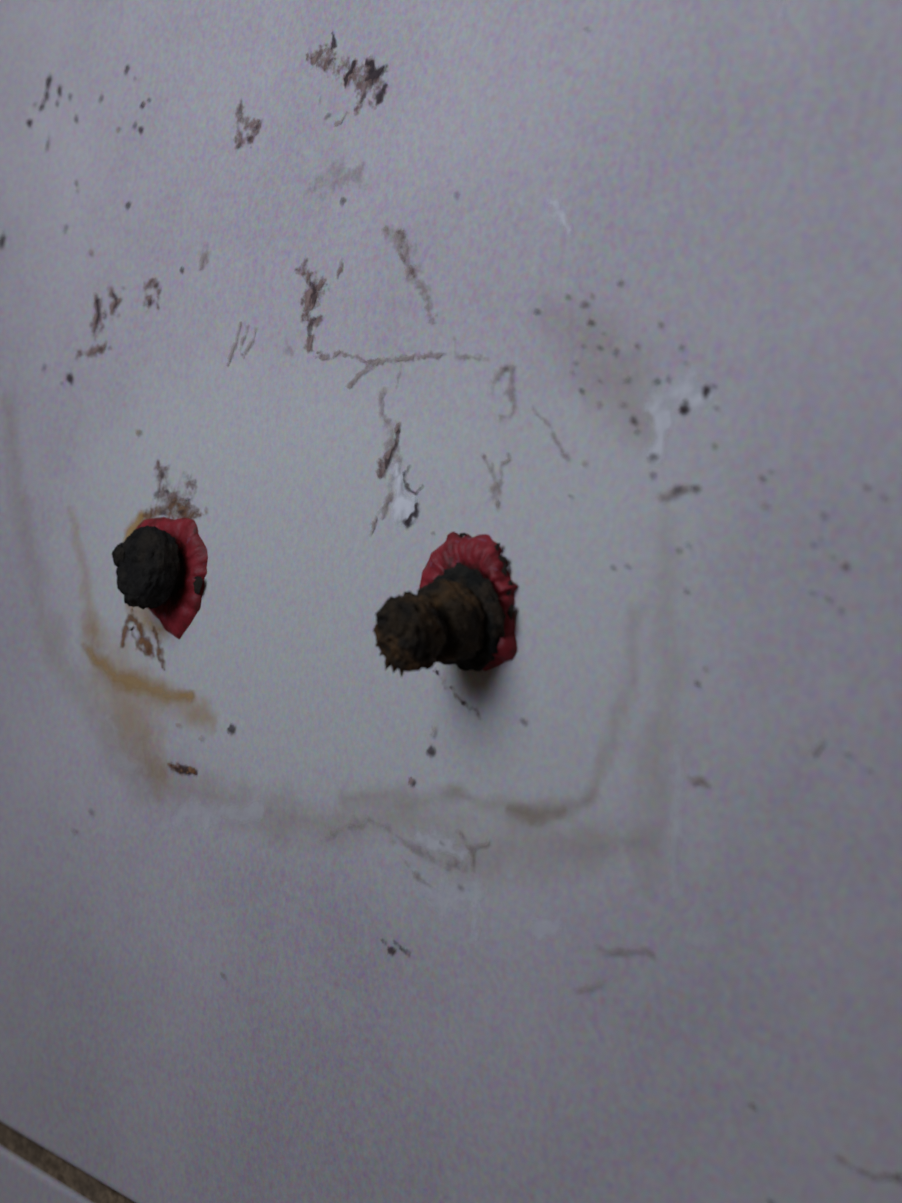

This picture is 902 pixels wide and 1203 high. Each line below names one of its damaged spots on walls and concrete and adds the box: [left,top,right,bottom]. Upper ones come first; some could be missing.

corrosion [375,643,405,677]